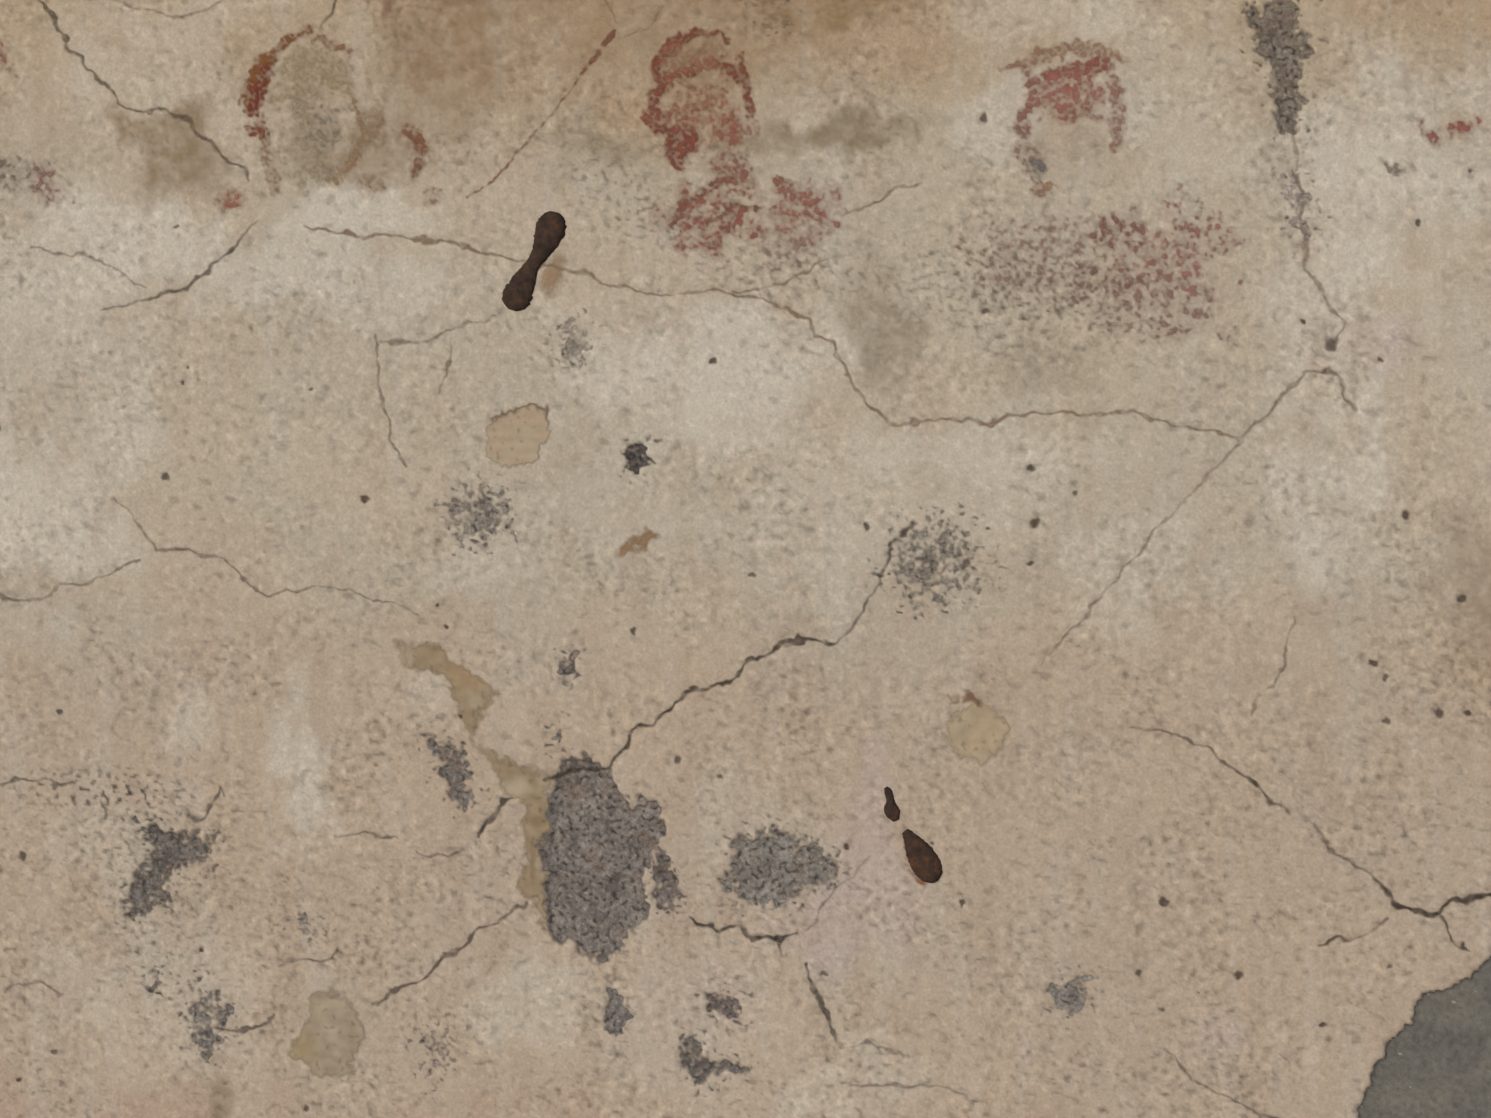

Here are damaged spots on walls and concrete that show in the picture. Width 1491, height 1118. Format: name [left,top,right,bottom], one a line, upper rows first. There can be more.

crack [40,1,248,177]
spalling [1241,0,1325,139]
crack [149,240,239,300]
crack [307,227,639,292]
crack [549,635,835,779]
spalling [422,730,483,812]
spalling [121,815,224,921]
crack [378,902,527,1003]
spalling [537,726,685,963]
crack [691,918,870,1043]
spalling [718,824,849,916]
crack [1375,880,1491,950]